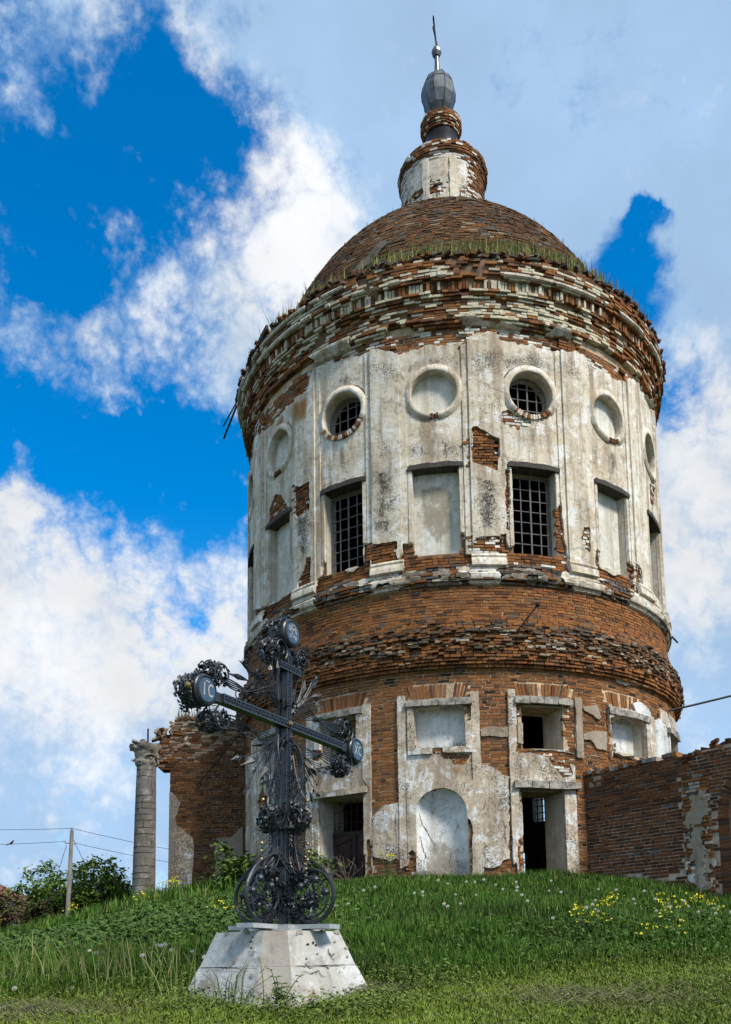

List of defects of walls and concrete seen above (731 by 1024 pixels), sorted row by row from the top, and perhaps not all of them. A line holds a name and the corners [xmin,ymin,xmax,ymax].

mould [373,462,395,534]
spalling [256,427,568,619]
mould [475,478,500,529]
spalling [581,527,642,590]
spalling [481,704,638,788]
flaking render [168,792,194,890]
flaking render [215,756,266,880]
flaking render [366,802,416,877]
flaking render [683,790,716,890]